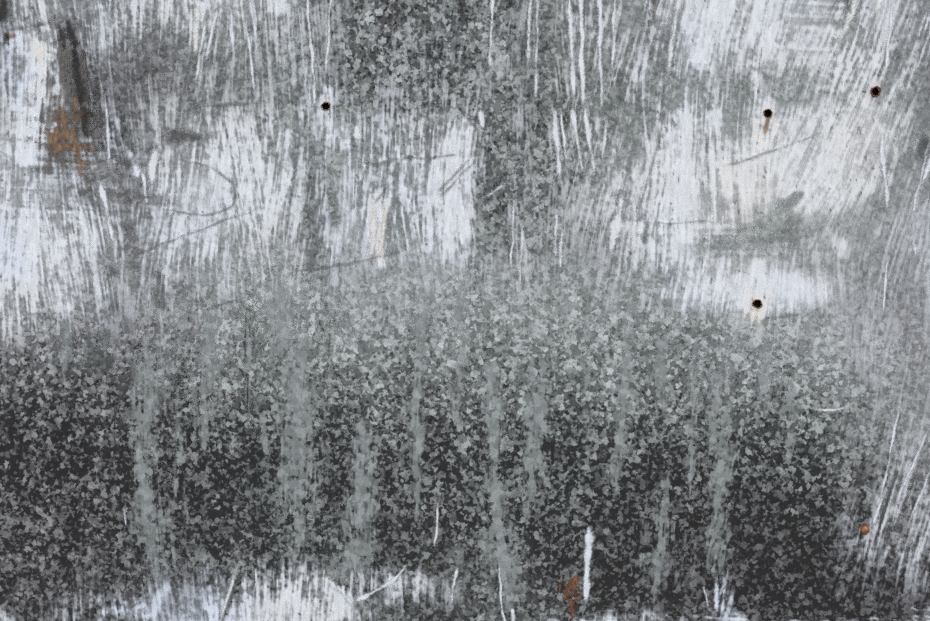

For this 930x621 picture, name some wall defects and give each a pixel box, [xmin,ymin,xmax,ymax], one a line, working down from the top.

corrosion [47,97,95,171]